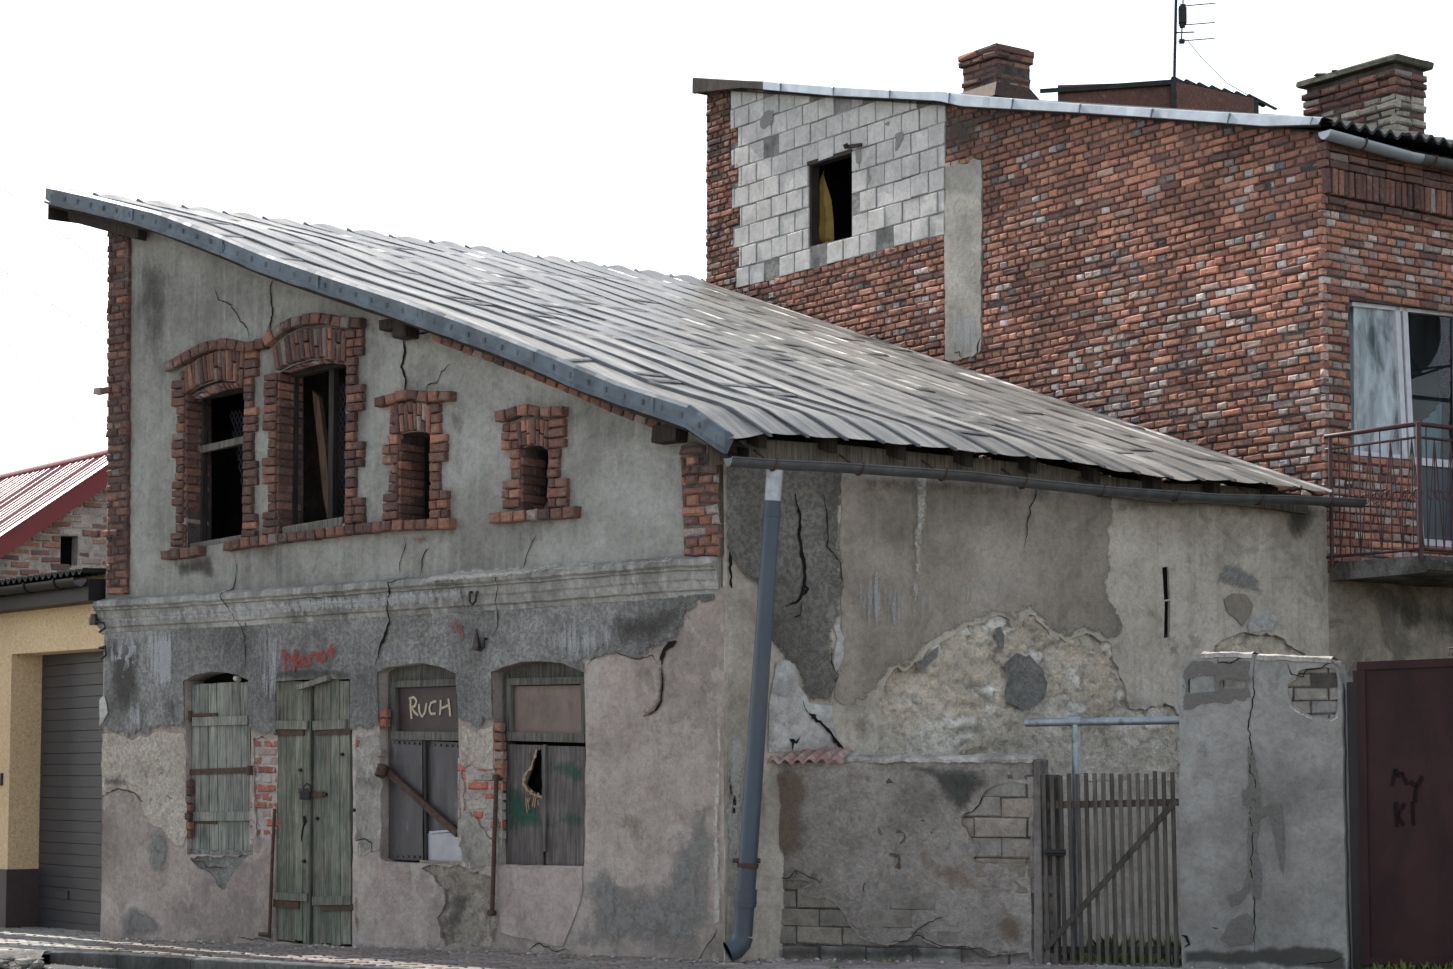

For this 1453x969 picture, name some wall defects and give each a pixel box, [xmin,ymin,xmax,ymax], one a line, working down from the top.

crack [213,280,273,336]
crack [375,537,429,664]
crack [786,493,844,617]
crack [790,702,844,751]
flaking render [833,624,845,671]
flaking render [875,615,1180,781]
flaking render [1213,593,1304,656]
flaking render [99,695,280,893]
flaking render [420,723,507,947]
crack [1217,657,1337,951]